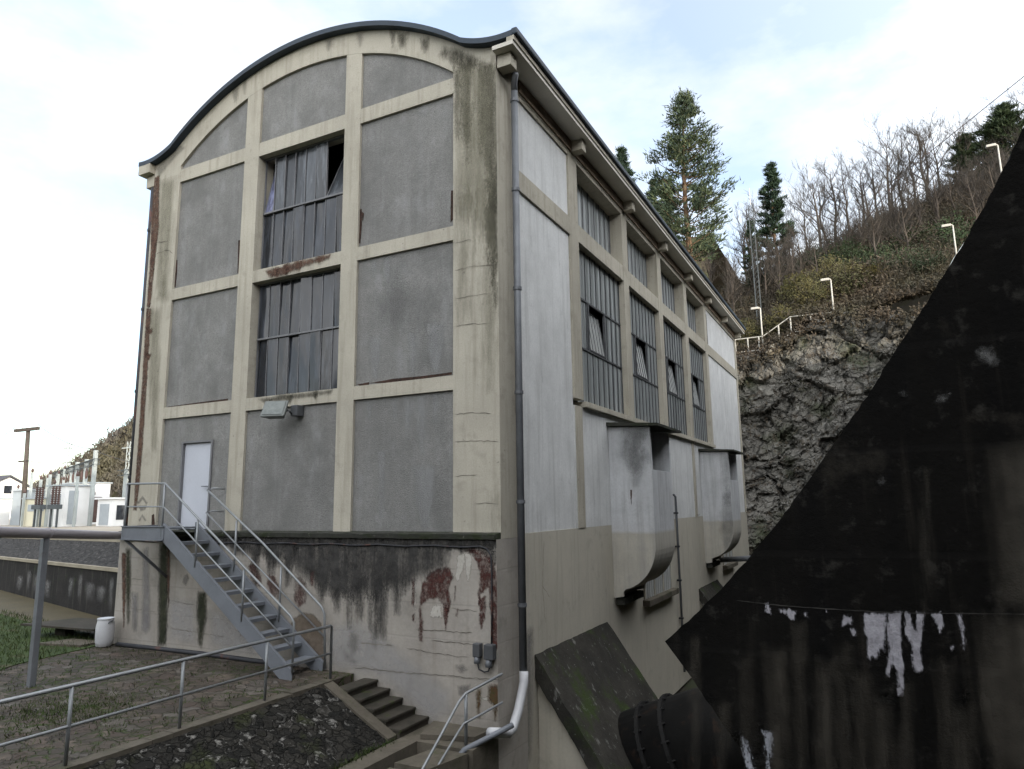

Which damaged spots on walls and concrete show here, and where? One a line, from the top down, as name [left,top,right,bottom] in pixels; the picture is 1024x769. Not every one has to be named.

leakage [442,50,497,275]
rust [266,254,331,278]
rust [133,176,159,510]
leakage [126,544,168,645]
leakage [197,592,206,645]
leakage [211,536,496,636]
peeling [411,548,497,650]